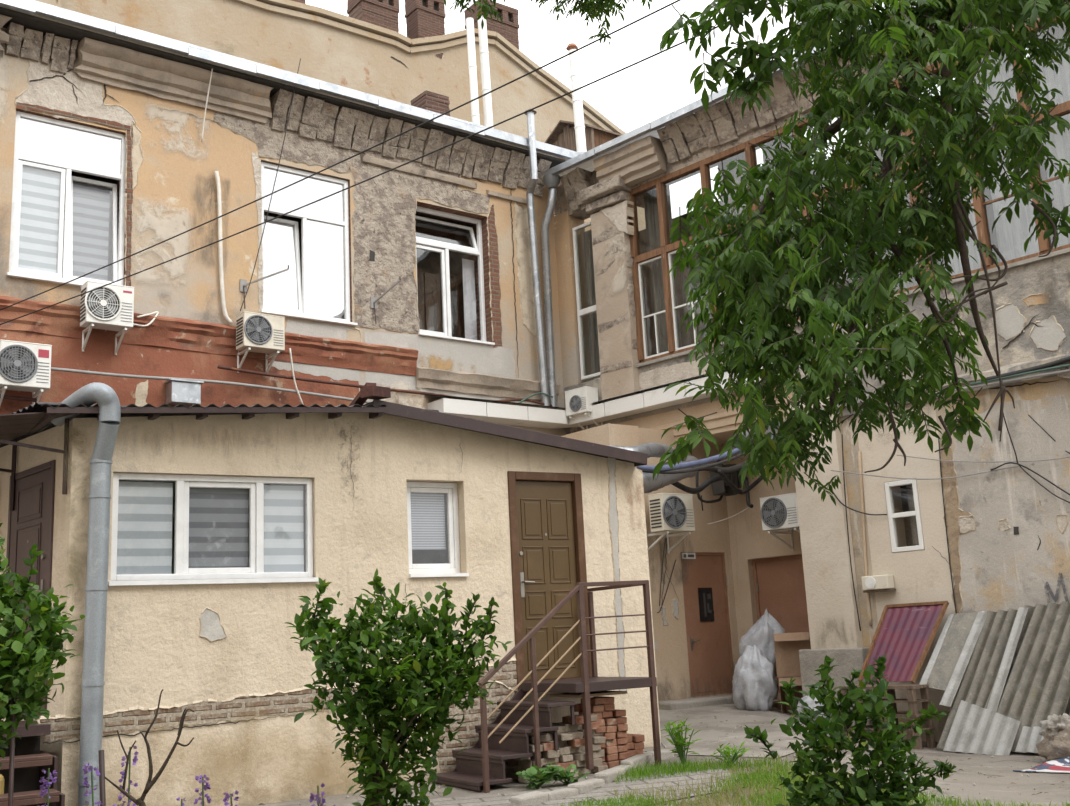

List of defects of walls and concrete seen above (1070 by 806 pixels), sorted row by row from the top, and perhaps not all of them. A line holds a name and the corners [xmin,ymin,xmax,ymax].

crack [30,69,118,104]
spalling [995,292,1066,352]
spalling [939,394,1070,613]
peeling [199,607,227,642]
spalling [37,714,81,743]
spalling [102,685,358,737]